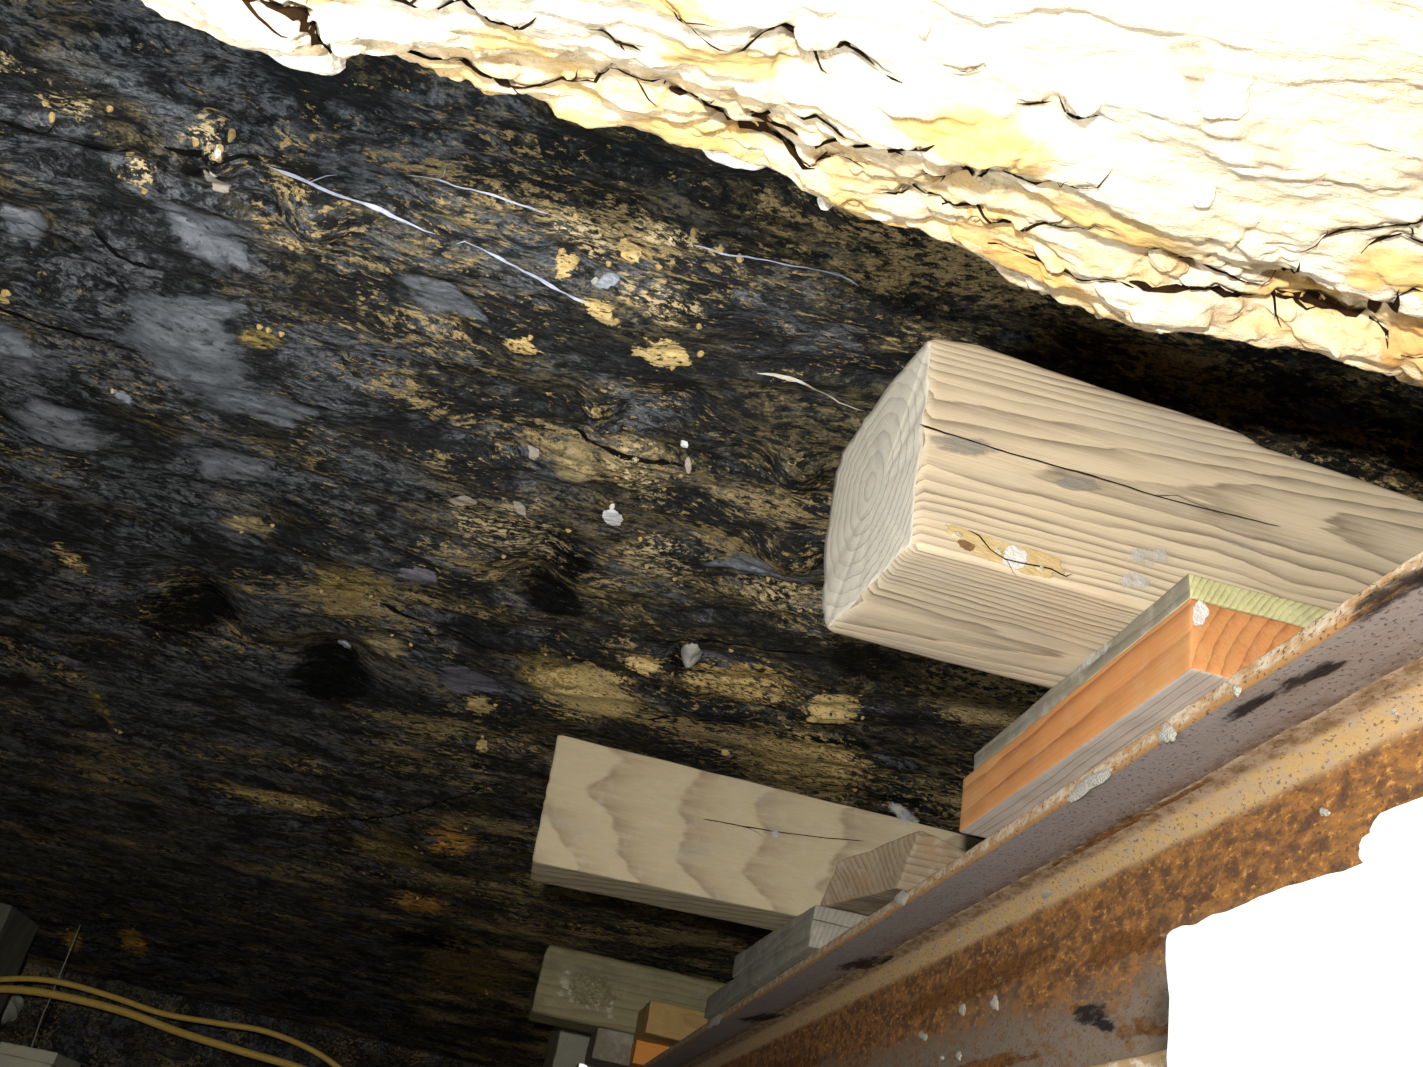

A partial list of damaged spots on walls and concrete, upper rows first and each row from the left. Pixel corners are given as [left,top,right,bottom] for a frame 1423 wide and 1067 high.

corrosion [1052,782,1207,868]
corrosion [1117,1016,1167,1039]
corrosion [958,1052,1039,1067]